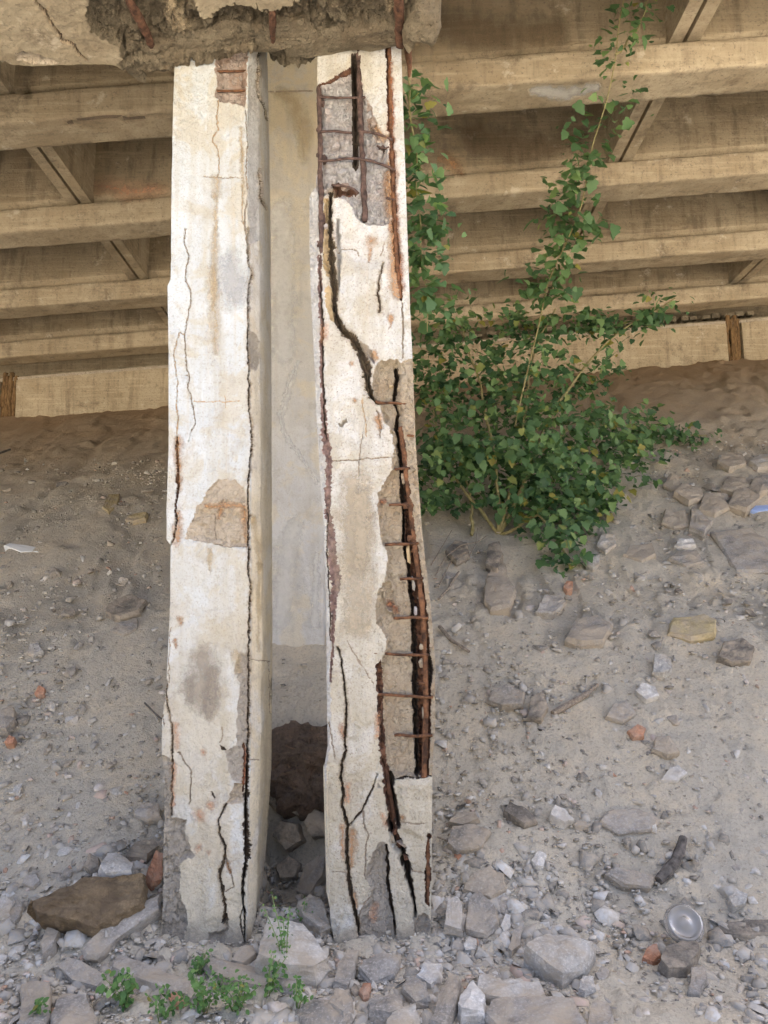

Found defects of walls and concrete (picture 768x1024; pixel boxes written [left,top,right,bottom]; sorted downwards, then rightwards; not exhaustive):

spalling [3,541,162,678]
spalling [0,611,207,1024]
spalling [185,479,248,547]
crack [171,53,313,937]
spalling [85,0,411,246]
corrosion [317,255,342,682]
crack [328,640,375,936]
crack [324,191,388,477]
corrosion [375,48,405,359]
corrosion [404,47,412,77]
spalling [232,358,768,1024]
spalling [180,973,222,1024]